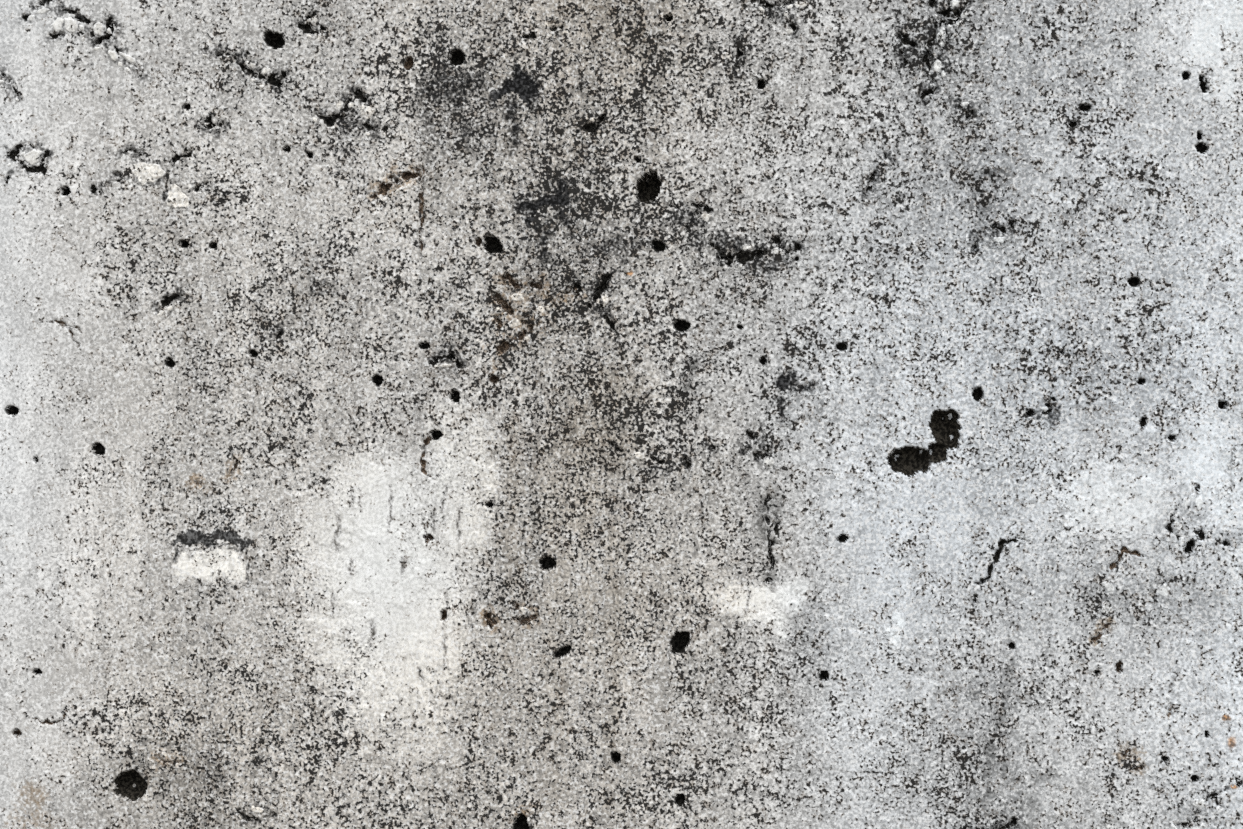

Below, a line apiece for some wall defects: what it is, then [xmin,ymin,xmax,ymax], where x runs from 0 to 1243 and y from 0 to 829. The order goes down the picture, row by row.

crack [972,535,1029,606]